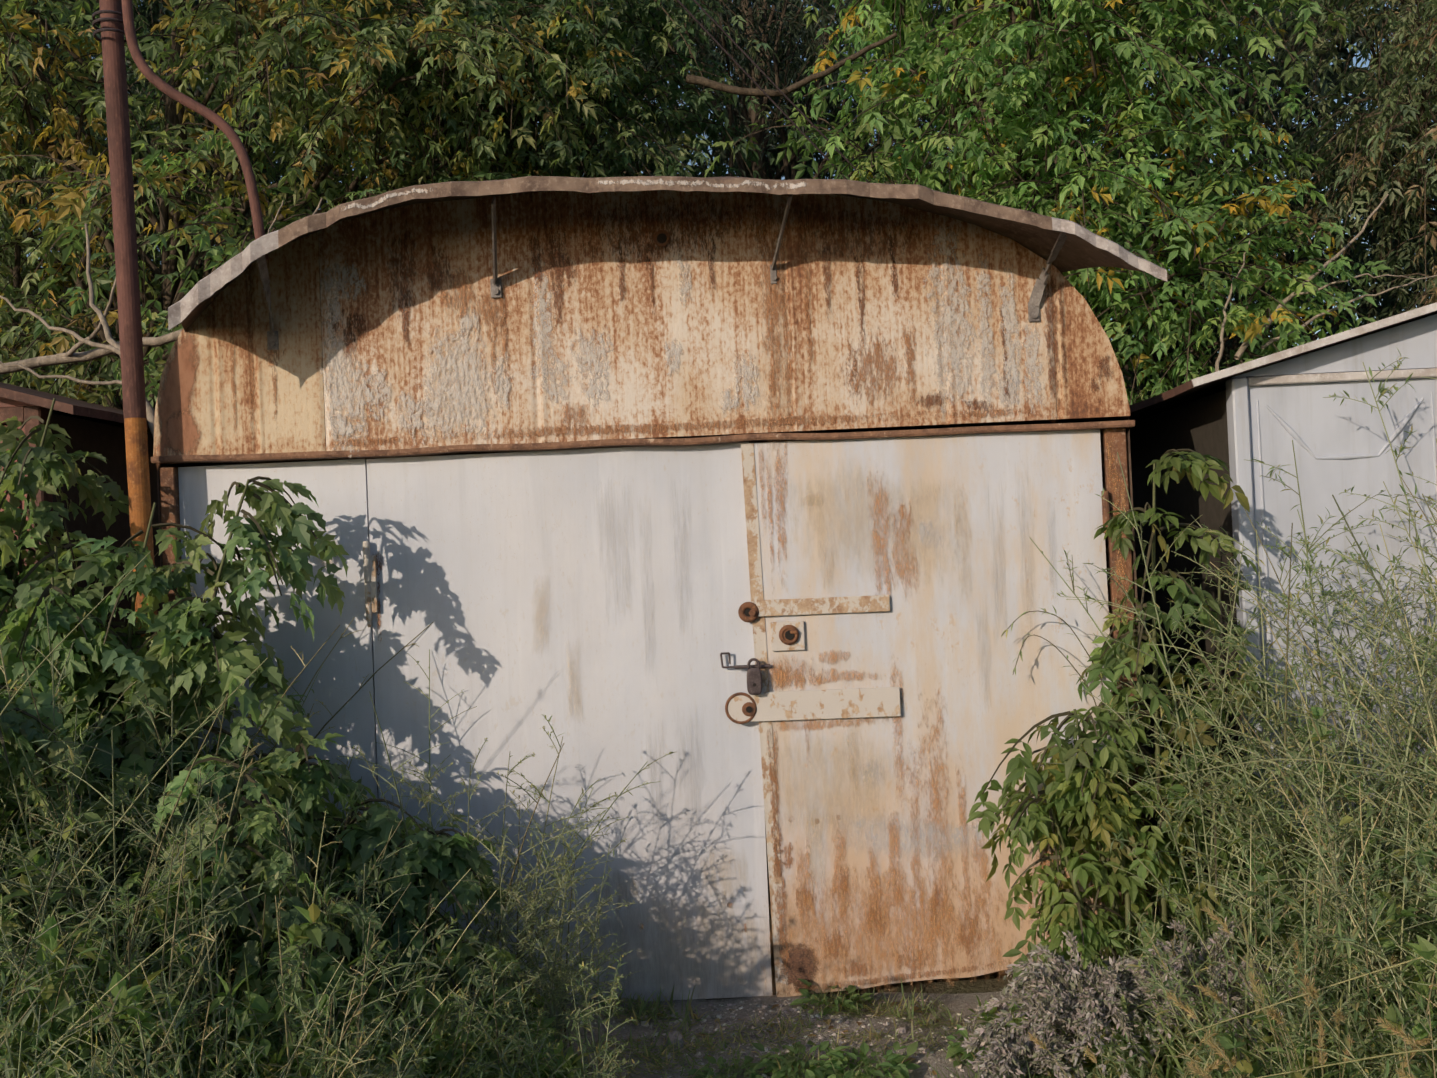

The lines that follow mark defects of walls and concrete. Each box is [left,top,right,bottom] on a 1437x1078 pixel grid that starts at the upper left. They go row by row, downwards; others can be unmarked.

corrosion [156,330,200,456]
corrosion [204,270,284,439]
corrosion [330,306,366,358]
corrosion [387,223,509,393]
corrosion [436,195,1030,442]
corrosion [1044,265,1067,407]
corrosion [1091,356,1113,391]
corrosion [760,457,787,554]
corrosion [873,492,914,596]
corrosion [771,652,903,735]
corrosion [767,717,1000,993]